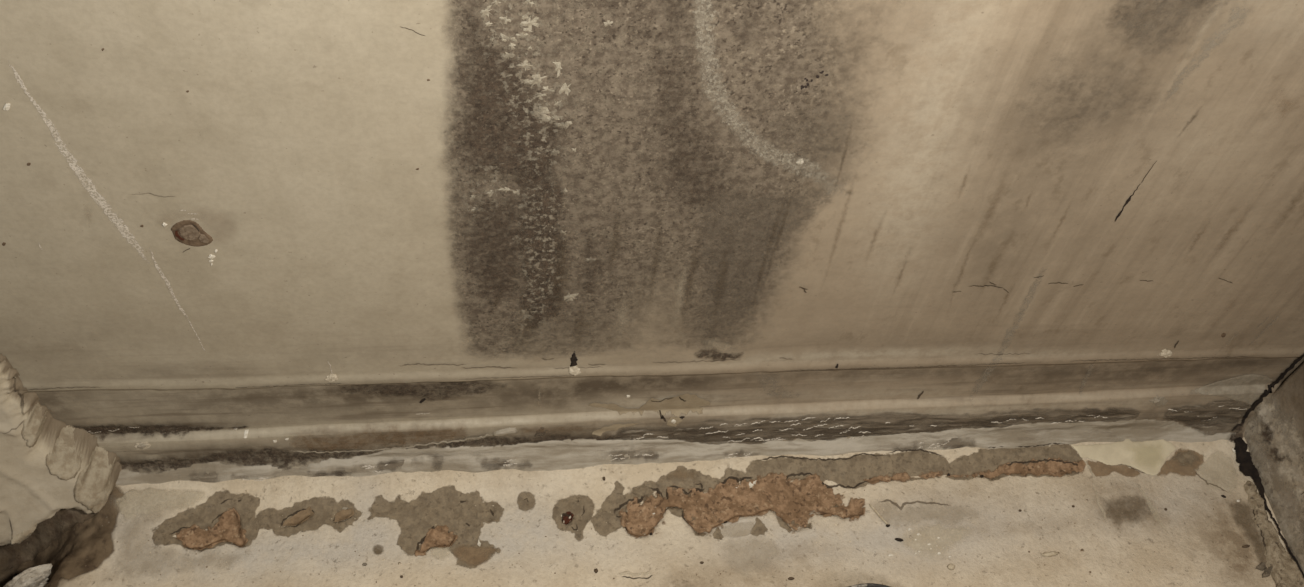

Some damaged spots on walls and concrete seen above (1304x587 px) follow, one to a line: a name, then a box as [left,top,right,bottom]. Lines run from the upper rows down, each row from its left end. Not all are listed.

water stain [448,0,846,360]
crack [1115,161,1157,222]
spalling [21,403,116,513]
water stain [74,425,247,439]
water stain [119,448,374,472]
water stain [414,436,612,449]
crack [1231,354,1304,587]
spalling [11,524,38,545]